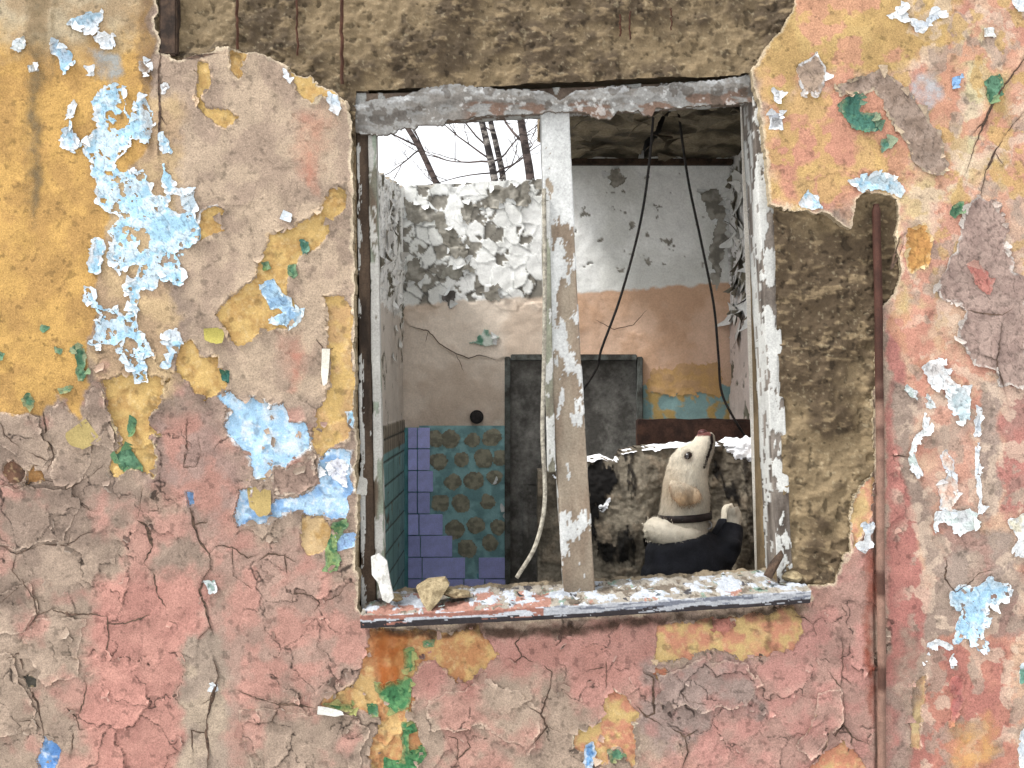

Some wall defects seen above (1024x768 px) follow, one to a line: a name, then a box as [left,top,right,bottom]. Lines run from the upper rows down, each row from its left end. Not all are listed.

flaking render [172,0,795,152]
crack [967,60,1024,194]
peeling [54,82,368,573]
peeling [379,180,531,361]
flaking render [758,170,935,588]
peeling [892,358,990,537]
crack [0,413,166,736]
crack [190,509,342,640]
crack [191,661,316,766]
peeling [283,627,517,768]
crack [515,631,561,743]
crack [634,670,697,768]